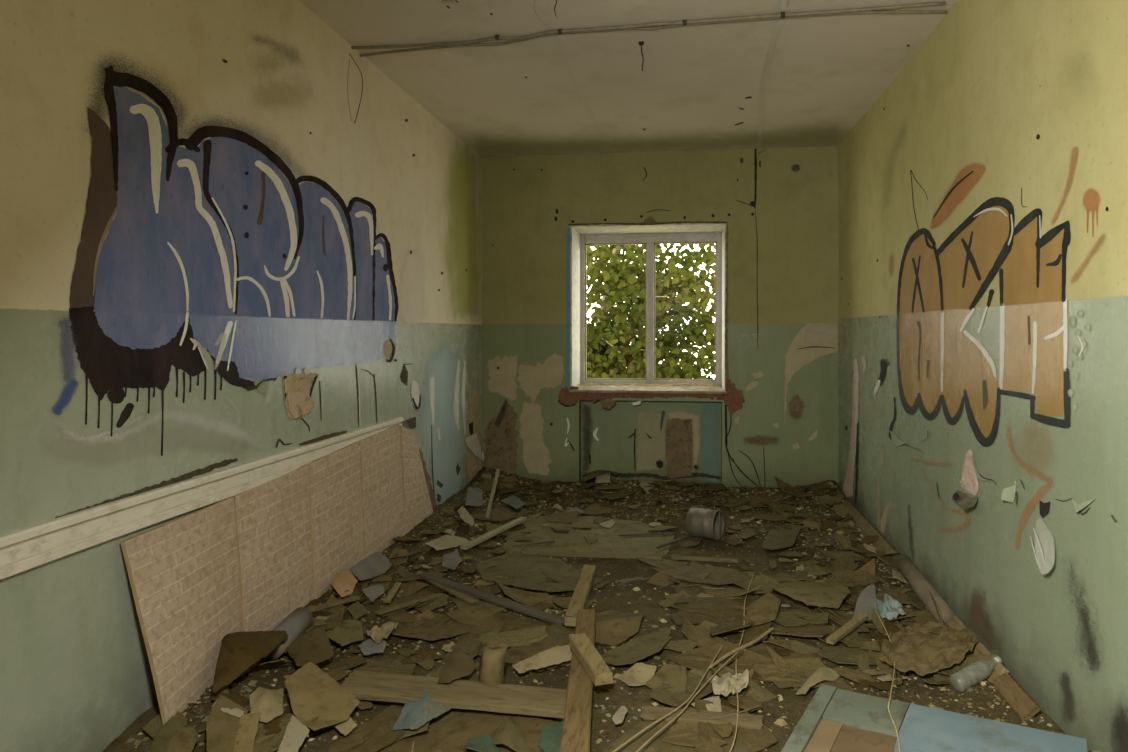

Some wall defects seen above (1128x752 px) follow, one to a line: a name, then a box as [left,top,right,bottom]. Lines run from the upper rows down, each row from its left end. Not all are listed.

spalling [247,367,318,420]
spalling [487,352,763,478]
peeling [773,322,845,428]
peeling [843,356,888,505]
peeling [952,449,1025,510]